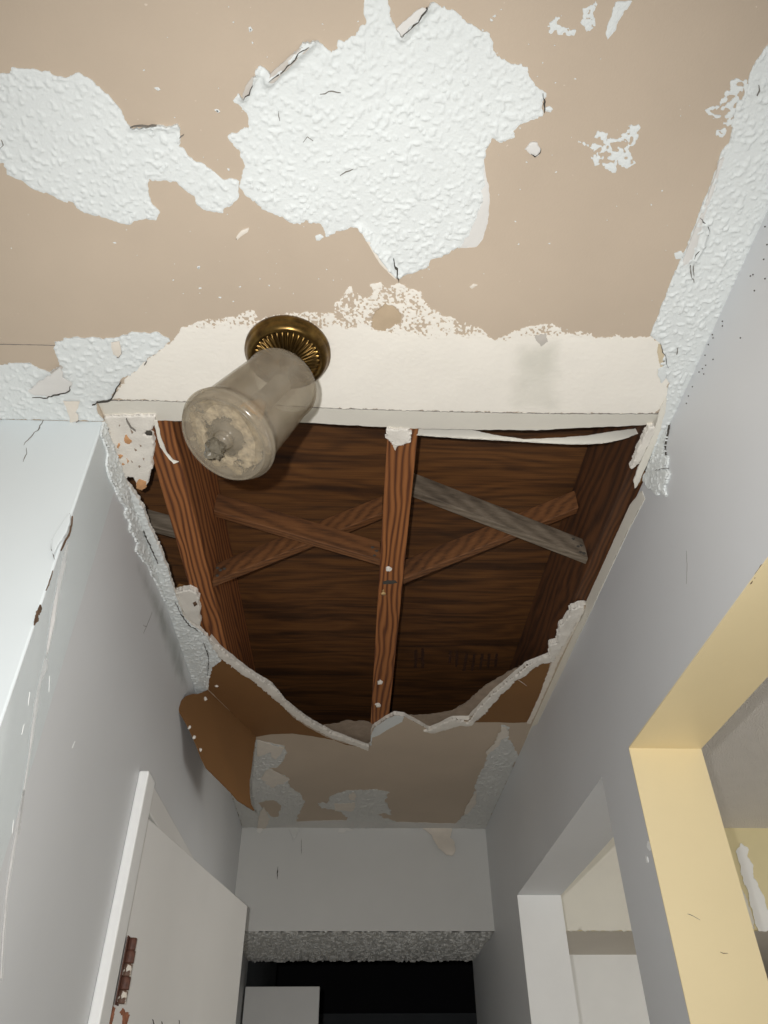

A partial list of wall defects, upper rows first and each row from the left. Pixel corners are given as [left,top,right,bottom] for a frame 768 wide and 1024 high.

peeling [0,0,553,282]
peeling [646,45,768,469]
peeling [0,331,170,423]
spalling [527,622,579,724]
peeling [231,740,305,829]
peeling [318,789,399,829]
peeling [423,725,518,856]